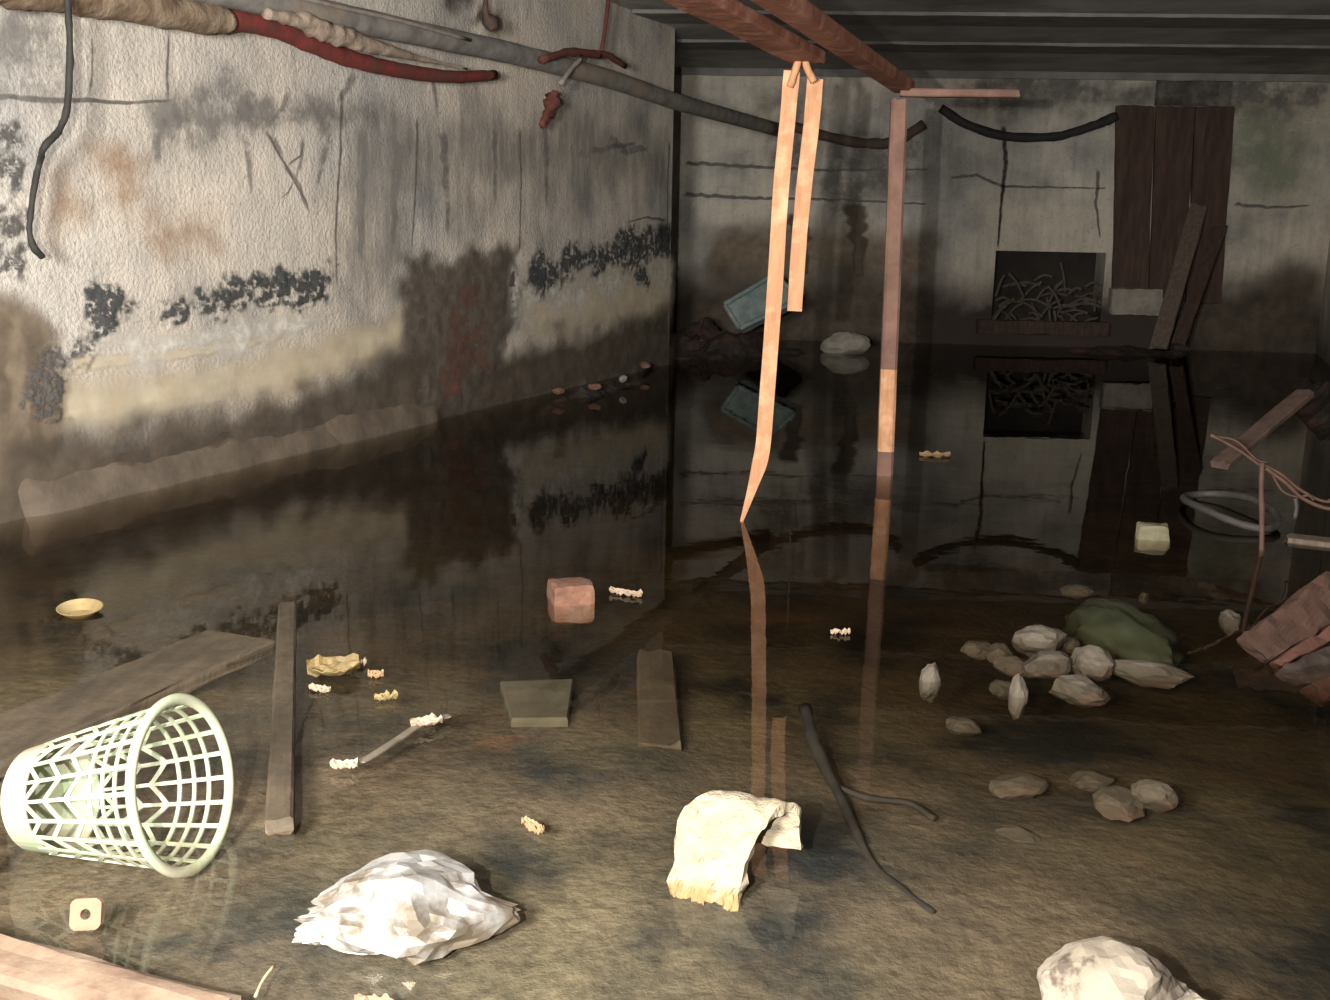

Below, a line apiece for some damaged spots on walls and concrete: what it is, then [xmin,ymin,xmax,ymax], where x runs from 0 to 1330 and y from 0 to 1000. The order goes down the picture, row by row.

damp [351,108,664,276]
damp [439,261,671,427]
damp [774,114,801,168]
damp [691,130,888,342]
damp [898,238,933,343]
damp [976,79,1325,112]
damp [0,296,422,564]